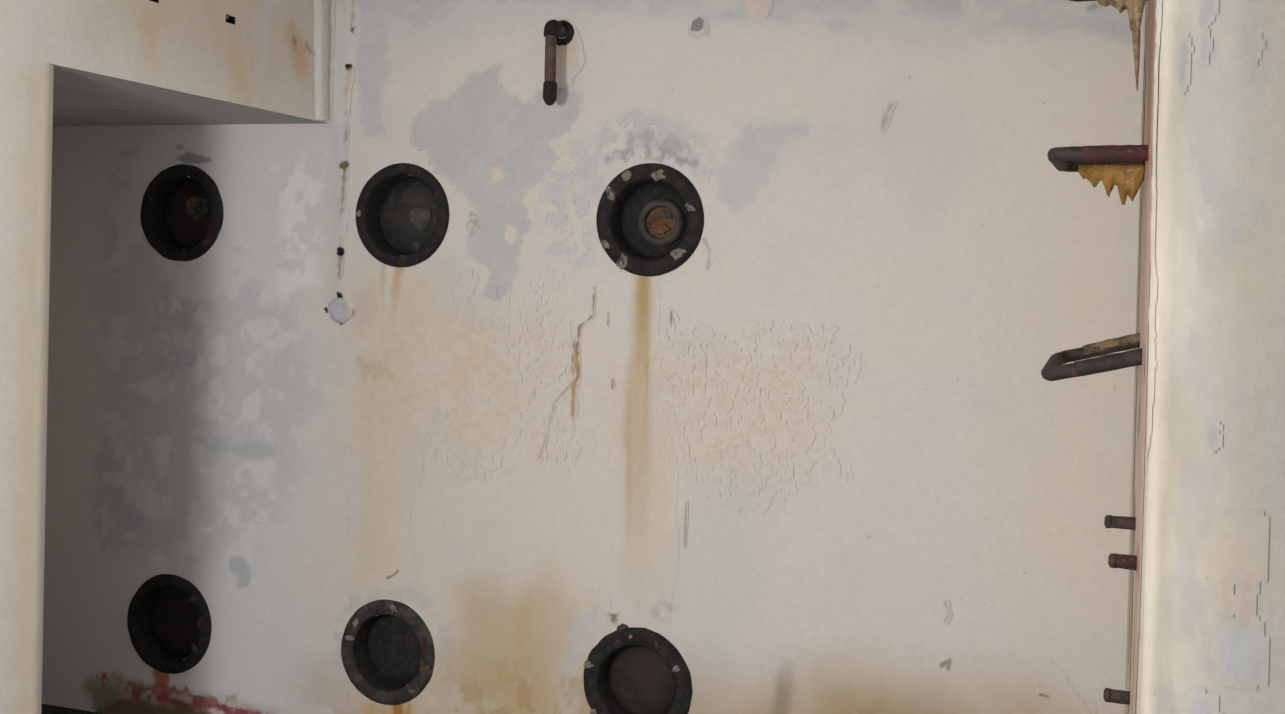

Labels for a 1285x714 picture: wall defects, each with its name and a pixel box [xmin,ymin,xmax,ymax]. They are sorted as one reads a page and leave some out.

peeling [350,0,1144,302]
peeling [70,135,386,592]
crack [537,286,596,461]
corrosion [331,251,679,714]
peeling [89,668,247,714]
damp [764,653,801,714]
corrosion [795,630,1097,714]